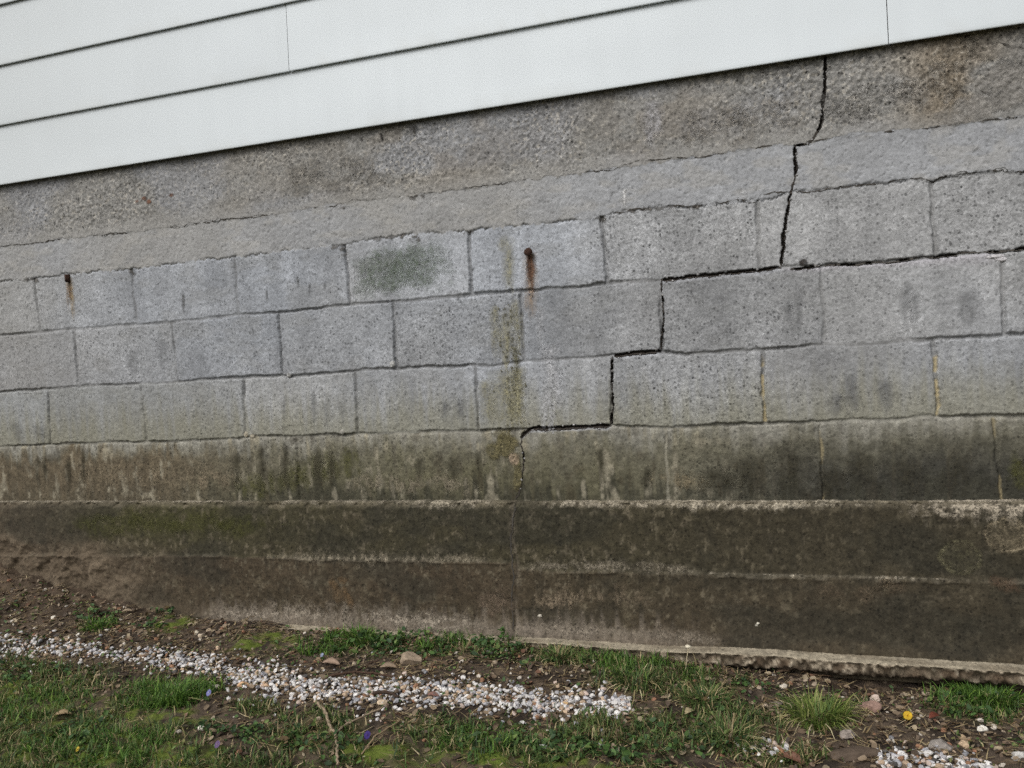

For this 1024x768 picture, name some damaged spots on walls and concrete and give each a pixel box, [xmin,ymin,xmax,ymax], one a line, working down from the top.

crack [510,55,1024,629]
leakage [402,500,490,508]
leakage [553,484,839,510]
leakage [926,499,1024,552]
leakage [220,606,468,633]